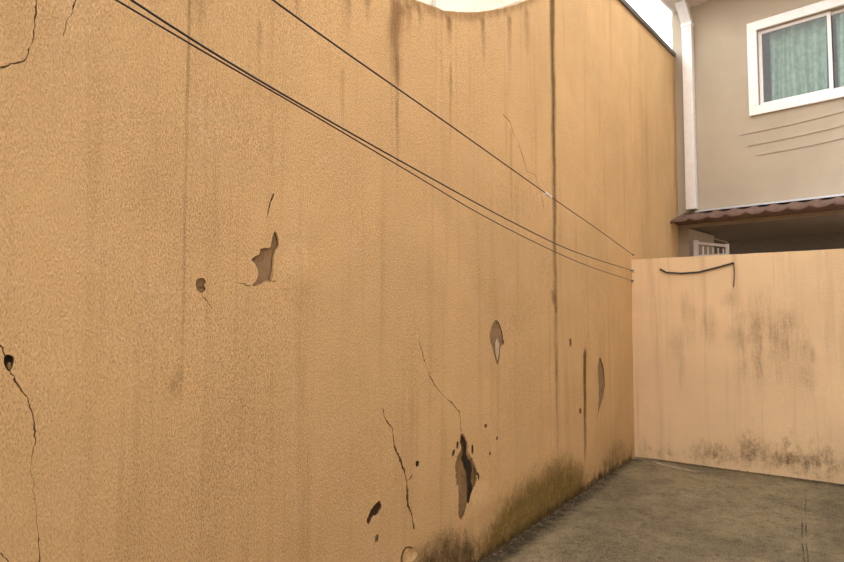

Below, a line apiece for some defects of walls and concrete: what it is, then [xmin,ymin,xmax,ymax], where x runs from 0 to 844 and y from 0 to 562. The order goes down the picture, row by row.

crack [0,0,37,69]
spalling [196,278,206,293]
spalling [252,231,279,286]
spalling [490,320,504,364]
crack [419,342,461,428]
spalling [597,358,605,416]
crack [0,345,40,562]
spalling [367,501,381,524]
crack [382,408,415,529]
spalling [452,434,479,521]
leakage [479,459,633,562]